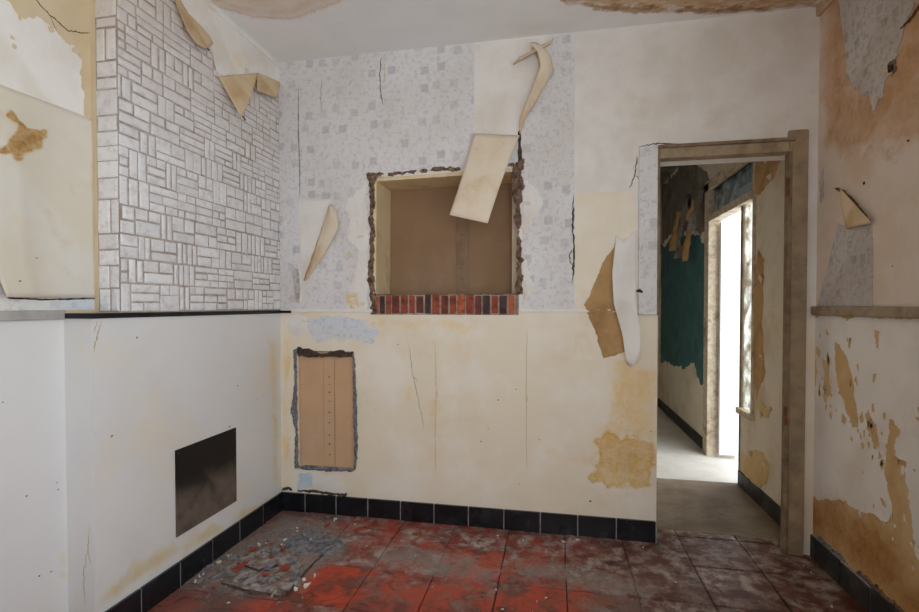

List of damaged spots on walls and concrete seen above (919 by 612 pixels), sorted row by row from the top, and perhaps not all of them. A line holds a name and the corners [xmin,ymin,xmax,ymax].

peeling [0,0,85,116]
crack [36,0,88,34]
flaking render [884,59,897,76]
flaking render [508,158,543,304]
peeling [751,160,781,195]
flaking render [288,166,461,494]
peeling [753,250,772,419]
peeling [741,450,770,488]
peeling [813,315,919,577]